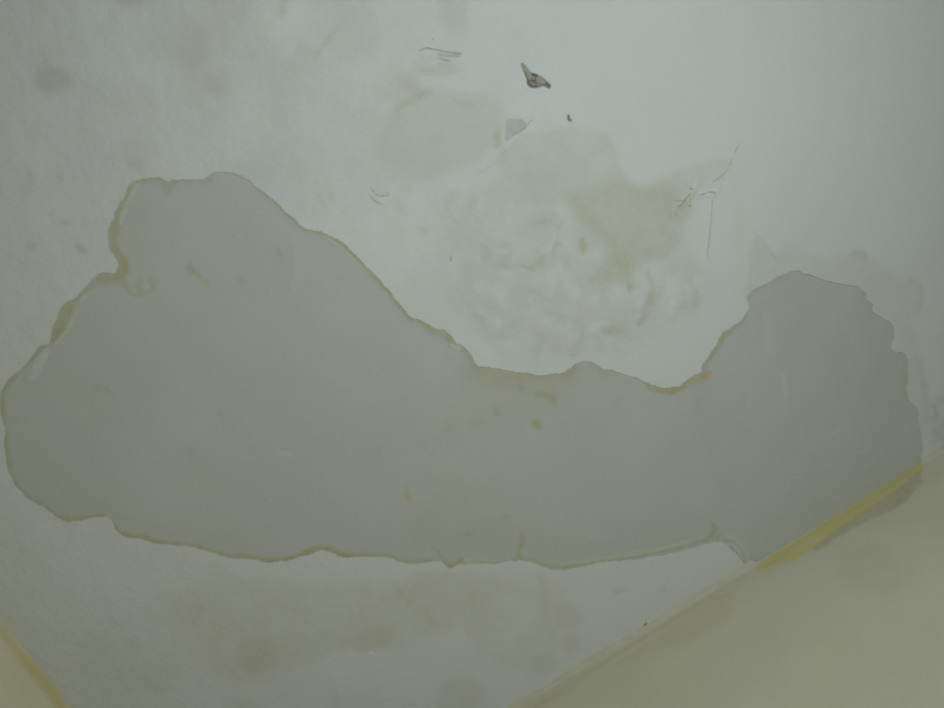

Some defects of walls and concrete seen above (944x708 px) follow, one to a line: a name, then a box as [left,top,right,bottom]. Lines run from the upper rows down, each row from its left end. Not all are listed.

peeling [0,172,923,570]
damp [365,62,735,410]